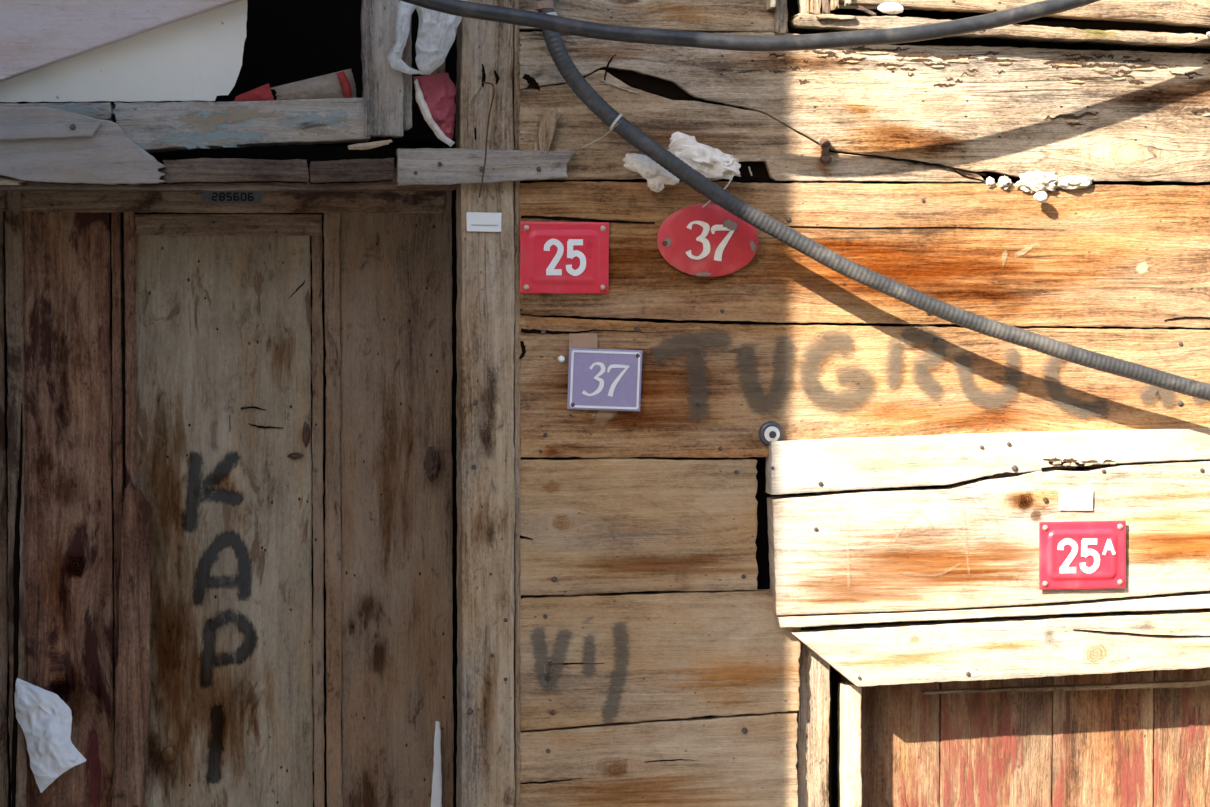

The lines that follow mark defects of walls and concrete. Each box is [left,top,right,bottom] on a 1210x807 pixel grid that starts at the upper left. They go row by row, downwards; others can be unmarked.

crack [481,64,540,91]
crack [594,54,724,106]
crack [829,151,986,181]
crack [984,461,1104,478]